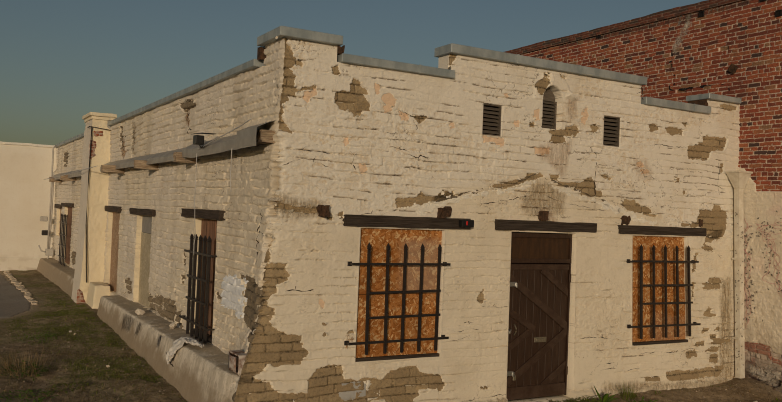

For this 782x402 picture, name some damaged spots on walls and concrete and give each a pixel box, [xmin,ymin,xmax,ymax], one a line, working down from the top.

peeling [273,36,317,134]
peeling [334,78,427,124]
peeling [534,108,600,155]
peeling [649,122,688,136]
peeling [687,135,729,161]
peeling [395,172,611,208]
peeling [619,199,656,217]
peeling [681,204,727,272]
peeling [148,252,187,328]
peeling [691,277,723,302]
peeling [231,234,445,402]
peeling [644,306,732,382]